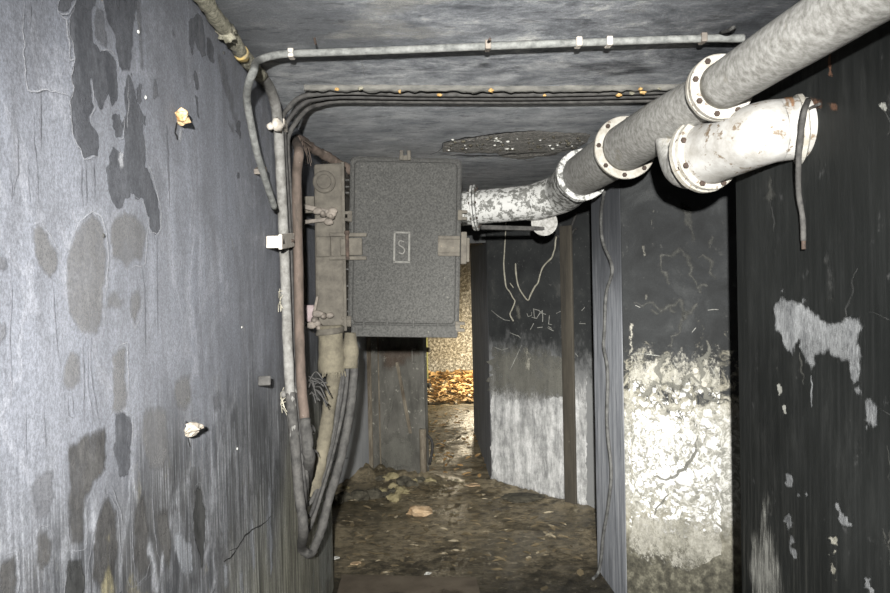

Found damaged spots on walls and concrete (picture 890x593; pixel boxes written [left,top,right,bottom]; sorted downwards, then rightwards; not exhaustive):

damp [189,14,233,112]
damp [10,0,207,593]
peeling [774,268,877,428]
damp [0,552,20,593]
crack [223,516,271,562]